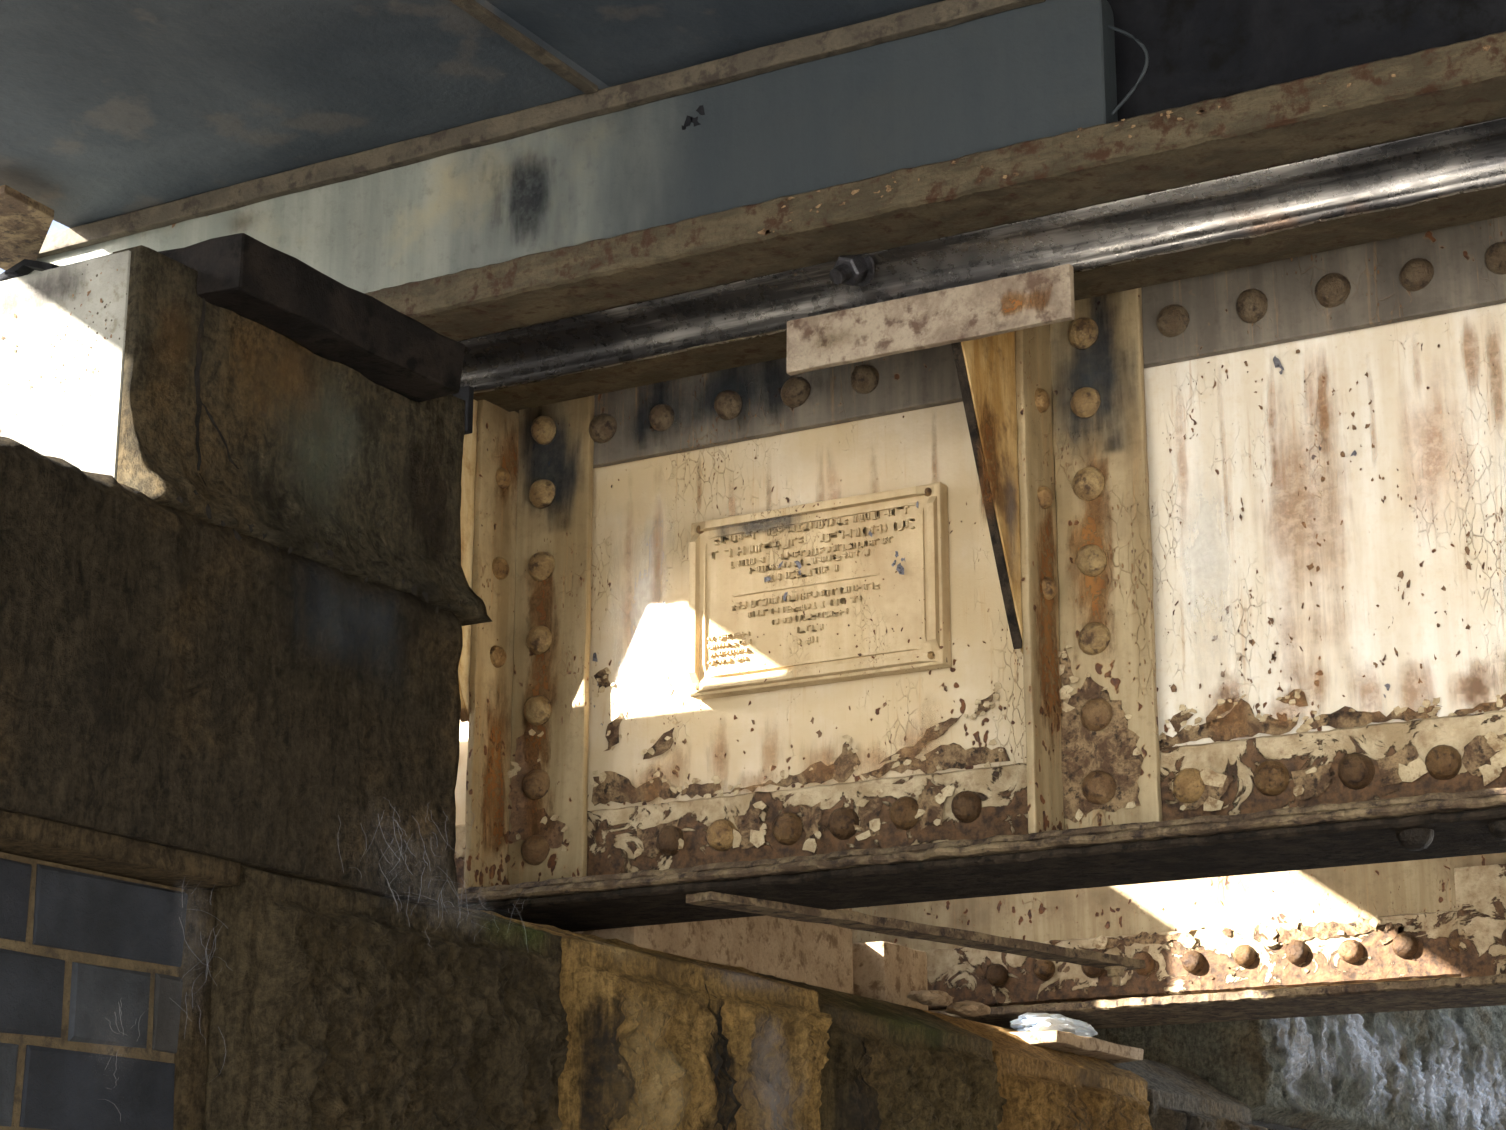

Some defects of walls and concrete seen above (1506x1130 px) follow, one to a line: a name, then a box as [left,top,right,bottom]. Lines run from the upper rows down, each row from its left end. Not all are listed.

water stain [510,165,548,233]
rust [1464,332,1474,373]
rust [1318,380,1327,429]
rust [1037,461,1112,742]
rust [482,572,558,852]
peeling [592,653,623,751]
peeling [590,682,1010,853]
peeling [1058,644,1144,823]
peeling [1159,621,1506,748]
peeling [1376,745,1428,787]
rust [1461,677,1487,701]
peeling [1461,731,1506,786]